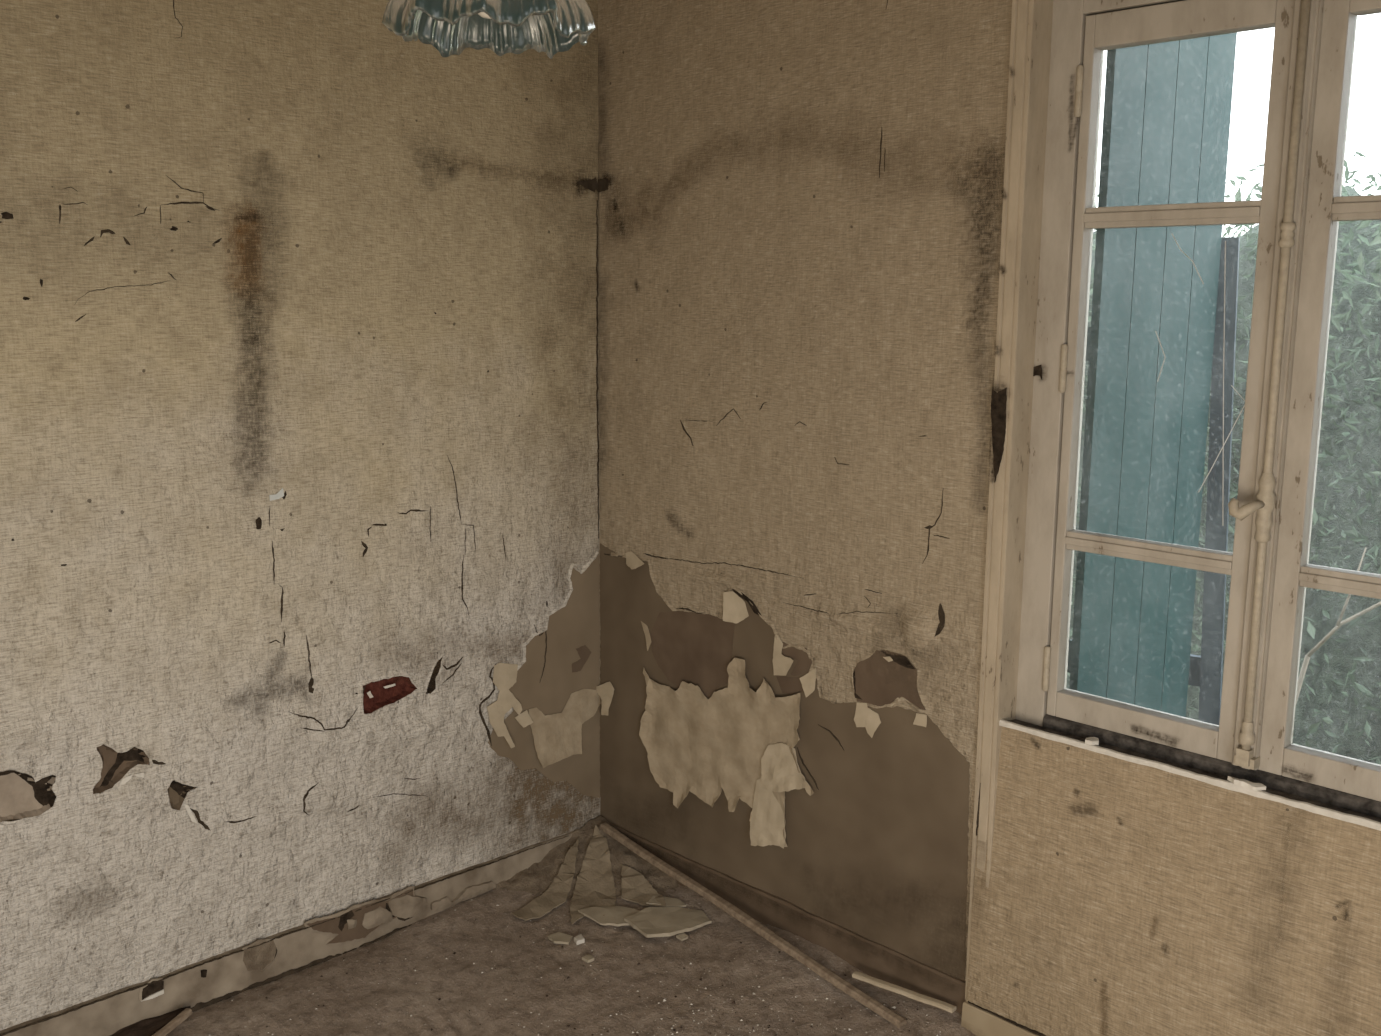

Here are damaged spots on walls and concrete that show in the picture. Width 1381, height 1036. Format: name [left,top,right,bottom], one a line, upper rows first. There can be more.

water stain [576,176,611,192]
crack [397,458,506,615]
flaking render [355,653,463,719]
spalling [0,763,62,829]
spalling [86,738,211,831]
peeling [479,543,970,981]